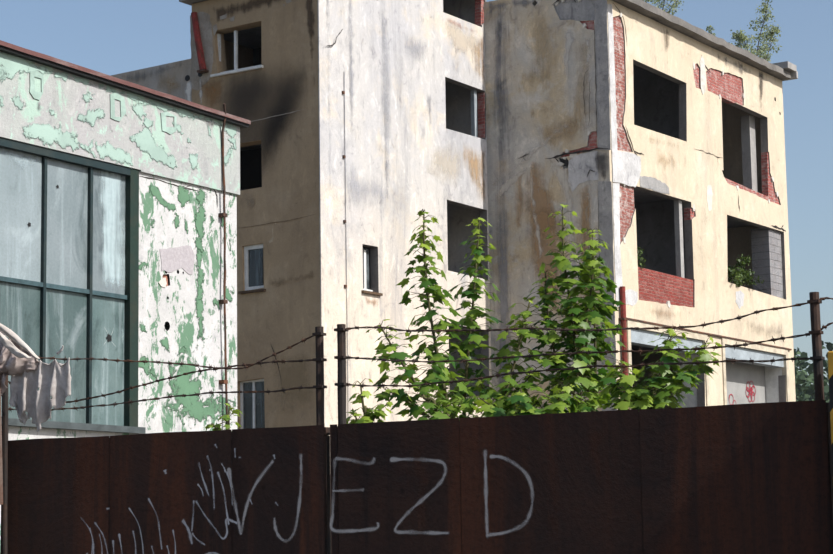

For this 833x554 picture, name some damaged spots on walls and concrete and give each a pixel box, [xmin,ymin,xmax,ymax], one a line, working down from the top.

leakage [217,0,272,20]
leakage [306,0,314,37]
peeling [0,52,213,170]
flaking render [477,92,485,138]
leakage [494,19,506,117]
crack [518,28,608,176]
flaking render [613,13,632,152]
flaking render [693,62,745,106]
flaking render [619,184,634,243]
flaking render [725,152,780,205]
peeling [148,185,236,432]
leakage [497,213,509,349]